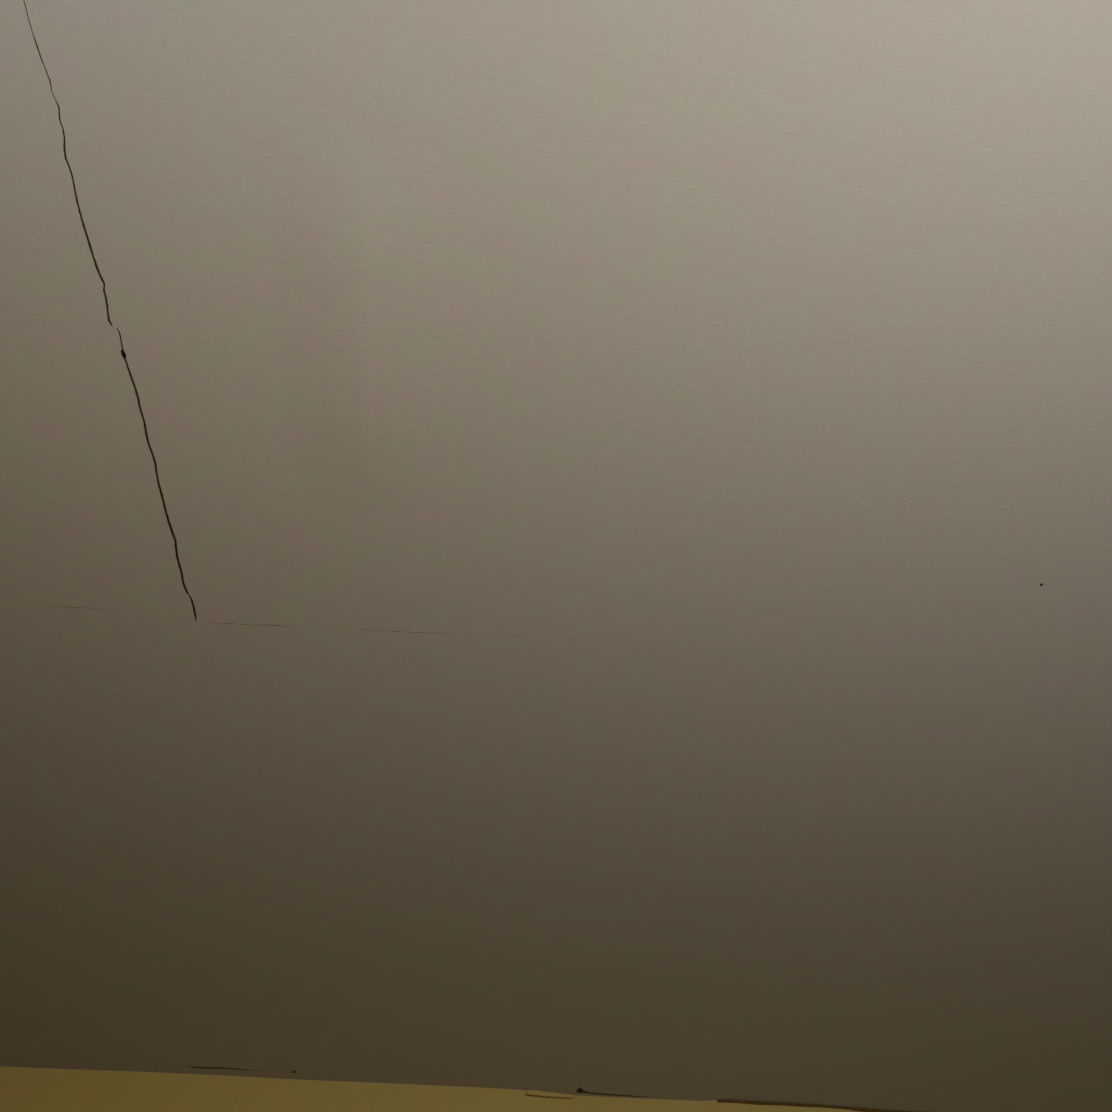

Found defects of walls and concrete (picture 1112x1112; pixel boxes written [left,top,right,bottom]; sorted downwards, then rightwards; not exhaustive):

crack [24,1,295,627]